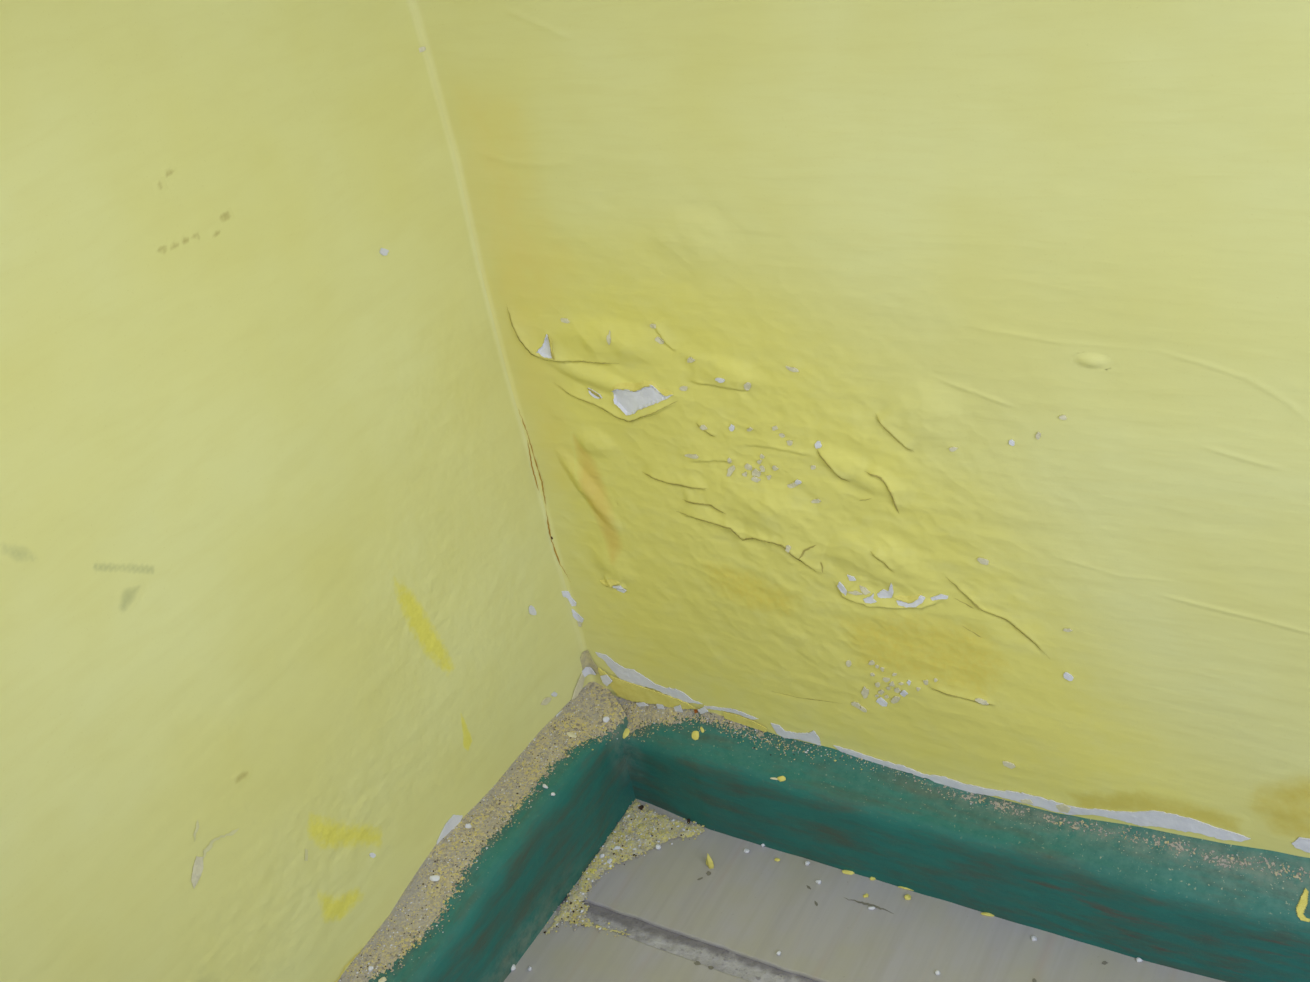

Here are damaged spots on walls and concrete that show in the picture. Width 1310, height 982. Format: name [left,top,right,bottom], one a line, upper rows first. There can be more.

peeling [536,334,555,360]
peeling [587,380,688,415]
peeling [727,454,779,482]
crack [817,450,899,513]
damp [426,41,1310,856]
crack [643,472,823,572]
peeling [837,574,948,608]
crack [948,579,1050,659]
peeling [335,650,1310,982]